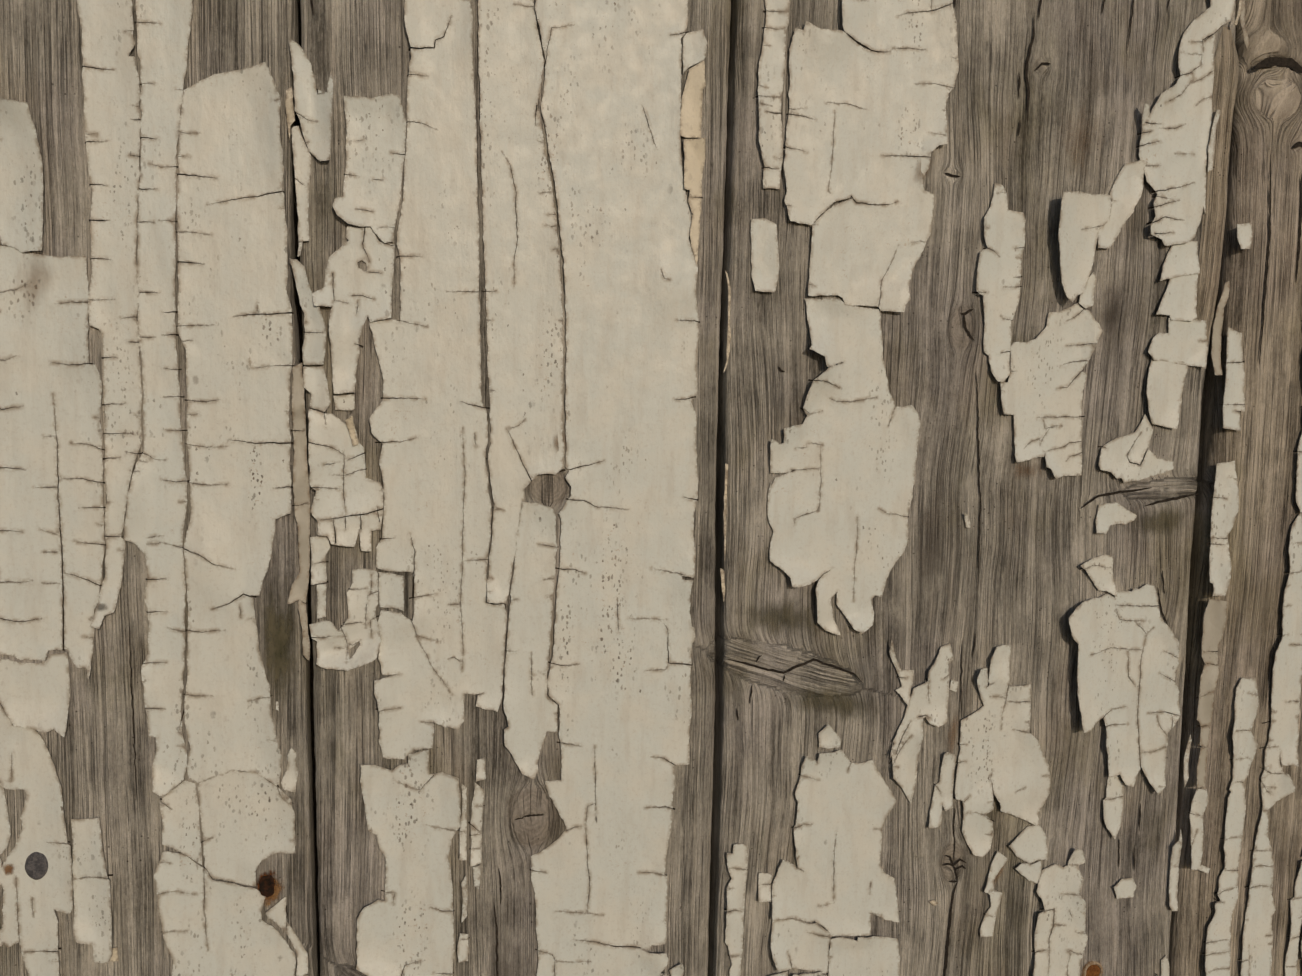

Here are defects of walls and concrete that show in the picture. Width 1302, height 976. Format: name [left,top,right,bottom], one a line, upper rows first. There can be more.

peeling [0,0,707,976]
crack [728,655,863,720]
peeling [750,0,959,635]
peeling [724,640,1088,976]
peeling [972,0,1252,483]
crack [1082,487,1197,508]
peeling [1069,433,1302,976]